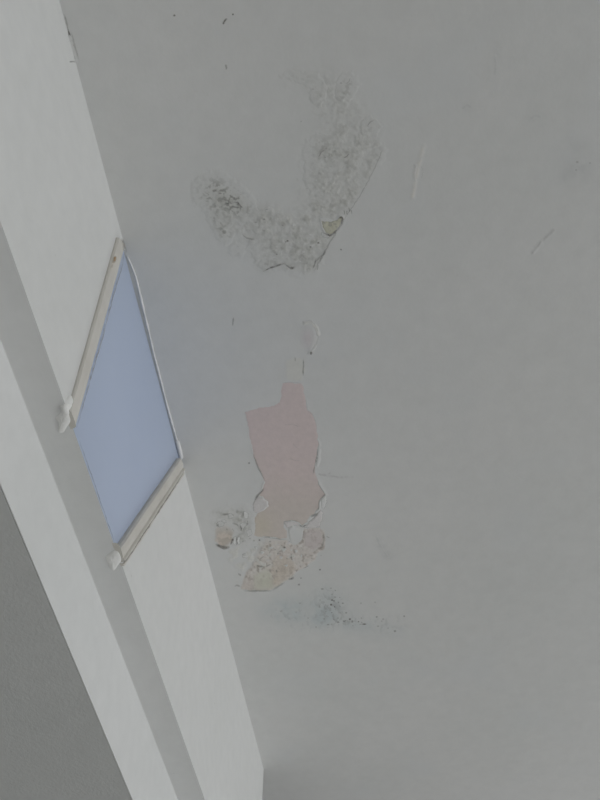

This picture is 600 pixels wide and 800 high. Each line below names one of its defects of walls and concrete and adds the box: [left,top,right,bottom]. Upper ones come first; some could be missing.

peeling [208,500,327,591]
leakage [236,573,424,647]